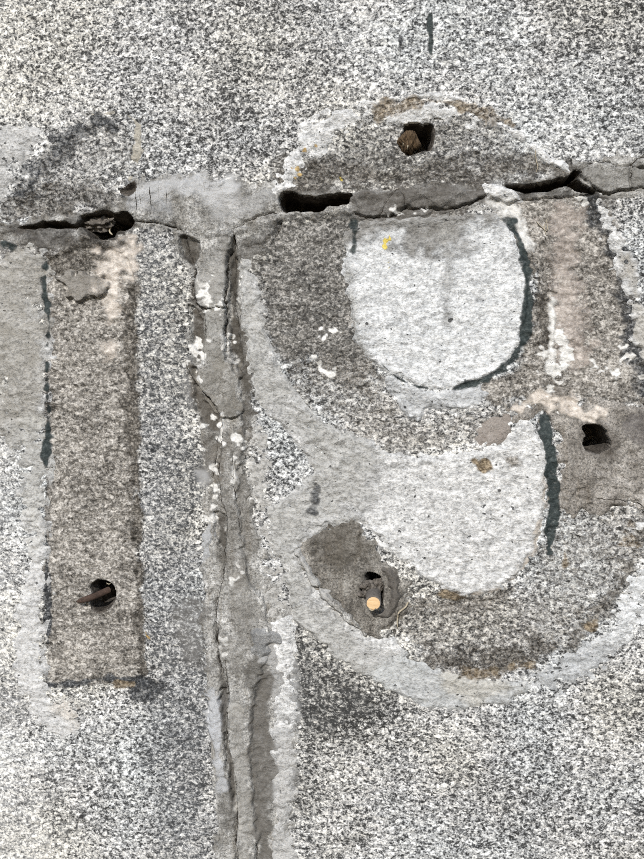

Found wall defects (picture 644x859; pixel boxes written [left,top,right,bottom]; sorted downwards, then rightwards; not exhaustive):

crack [355,189,483,219]
crack [515,157,644,201]
crack [136,212,282,348]
crack [186,364,242,734]
crack [235,781,258,859]